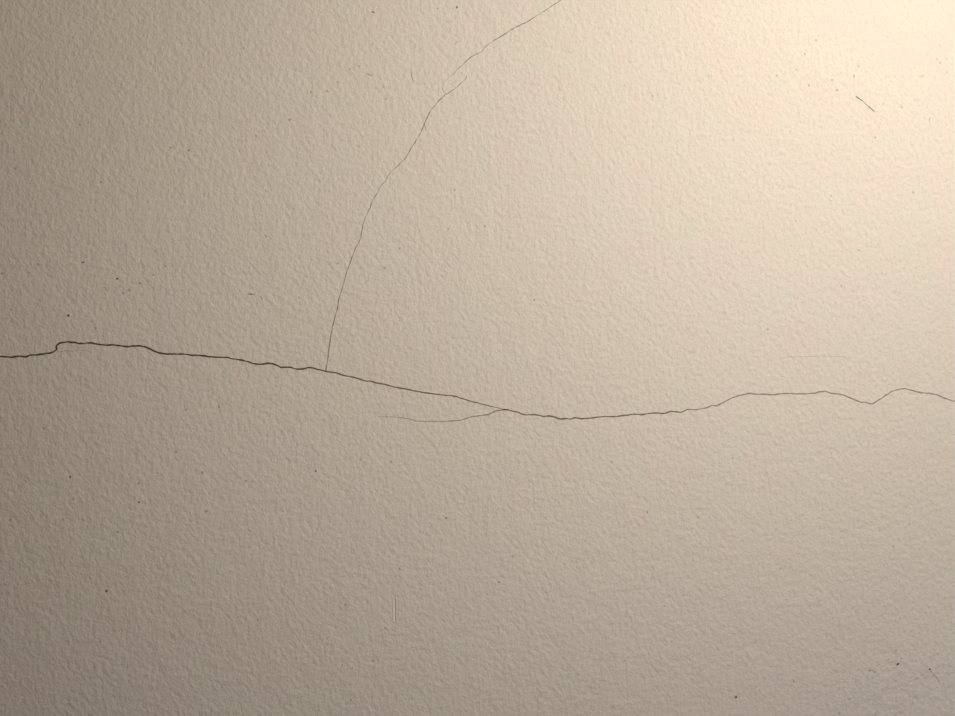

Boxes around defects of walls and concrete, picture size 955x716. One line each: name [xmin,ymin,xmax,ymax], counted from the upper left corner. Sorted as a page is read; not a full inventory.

crack [0,0,955,422]